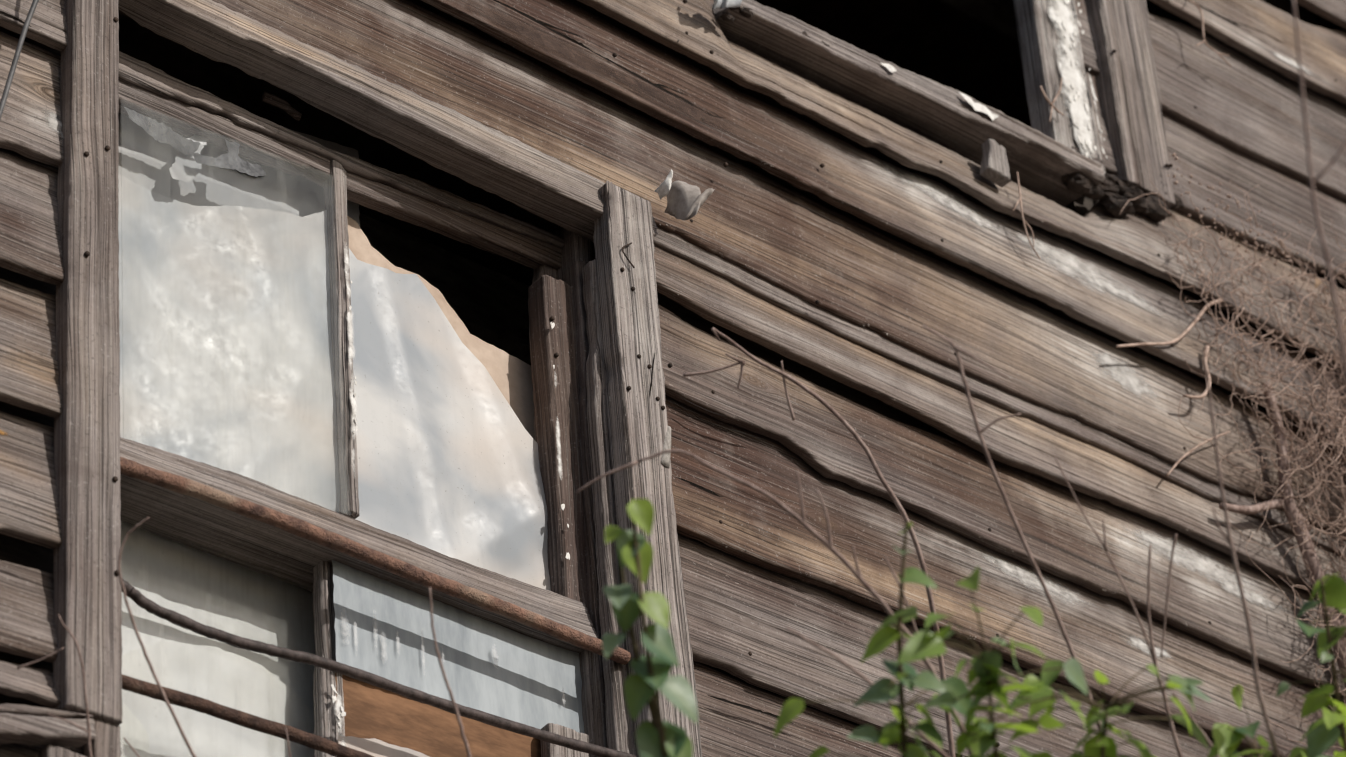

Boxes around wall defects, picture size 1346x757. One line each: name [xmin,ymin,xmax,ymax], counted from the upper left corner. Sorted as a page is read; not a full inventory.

spalling [1049,0,1184,223]